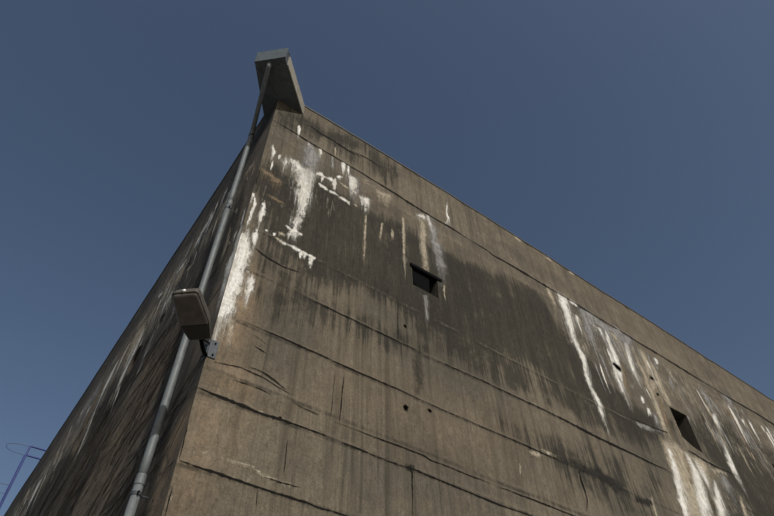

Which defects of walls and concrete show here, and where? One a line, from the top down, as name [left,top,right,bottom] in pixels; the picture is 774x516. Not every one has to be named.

efflorescence [14,188,230,516]
efflorescence [214,143,370,342]
crack [160,316,575,516]
efflorescence [419,213,446,269]
crack [309,298,667,470]
crack [275,121,774,425]
water stain [548,289,774,516]
crack [688,450,737,476]